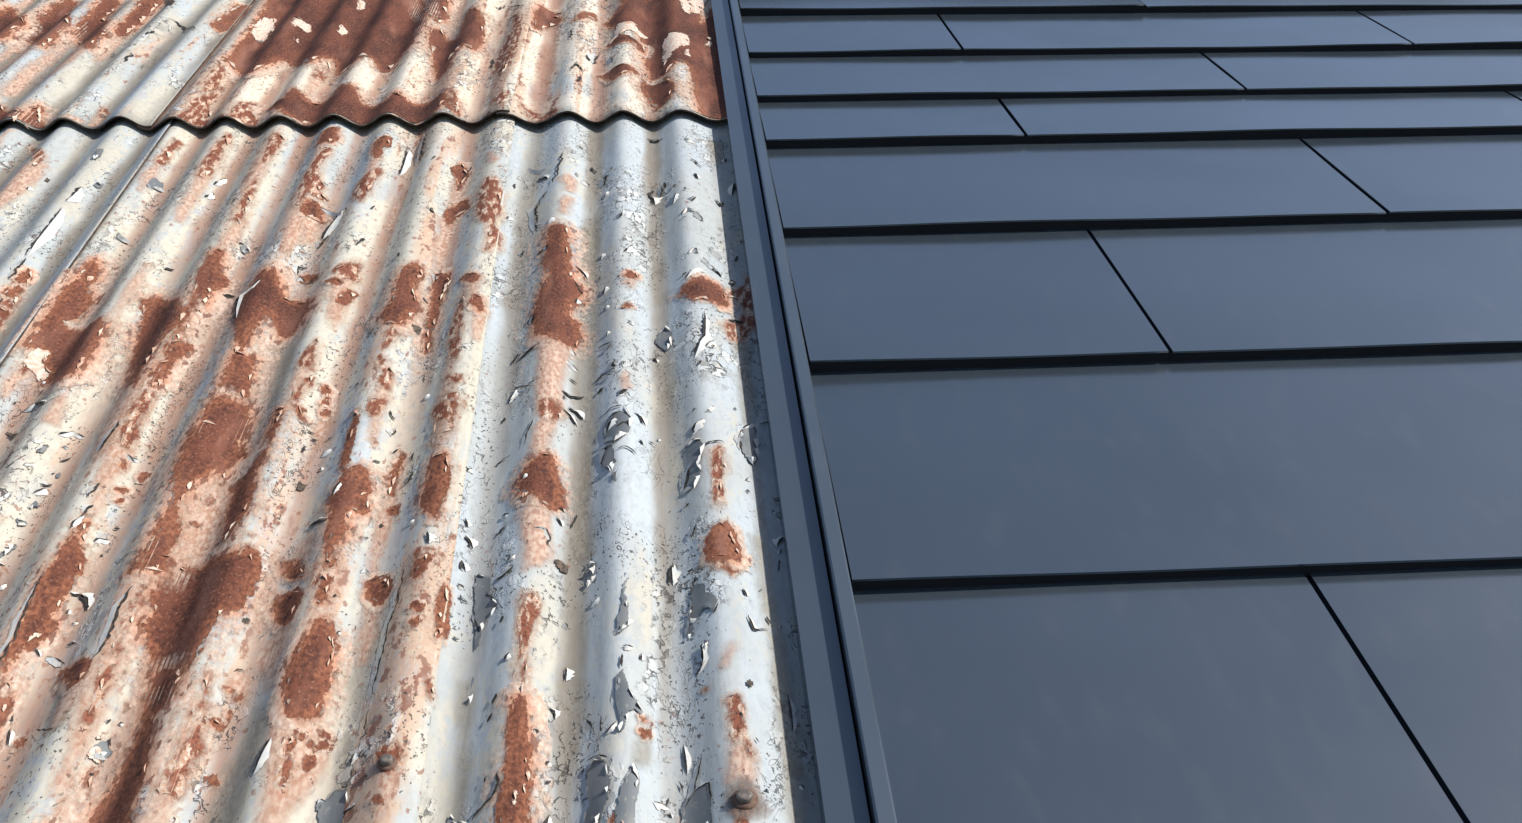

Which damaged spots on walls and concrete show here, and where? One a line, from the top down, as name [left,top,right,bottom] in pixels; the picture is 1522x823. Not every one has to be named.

rust [670,272,754,342]
peeling [16,432,84,526]
rust [0,0,727,823]
peeling [598,405,648,484]
peeling [681,418,706,495]
rust [699,440,753,577]
peeling [734,422,760,465]
peeling [554,559,597,587]
peeling [615,669,654,740]
peeling [583,754,640,823]
peeling [680,756,712,823]
rust [723,692,766,823]